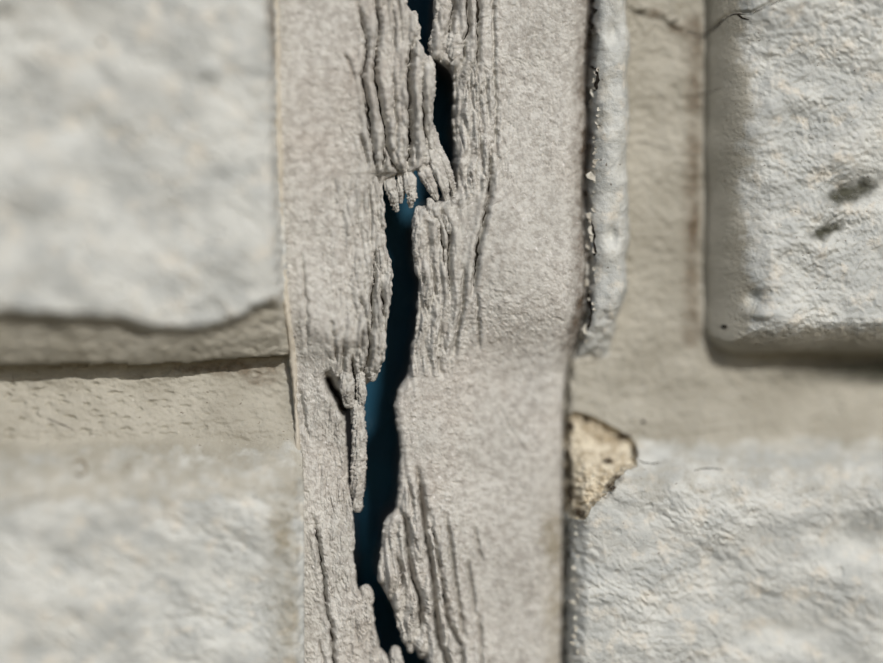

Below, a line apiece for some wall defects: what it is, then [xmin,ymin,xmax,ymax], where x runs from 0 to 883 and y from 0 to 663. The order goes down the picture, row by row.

crack [629,0,782,45]
crack [473,158,490,286]
crack [326,0,479,663]
spalling [563,412,638,520]
crack [315,528,335,663]